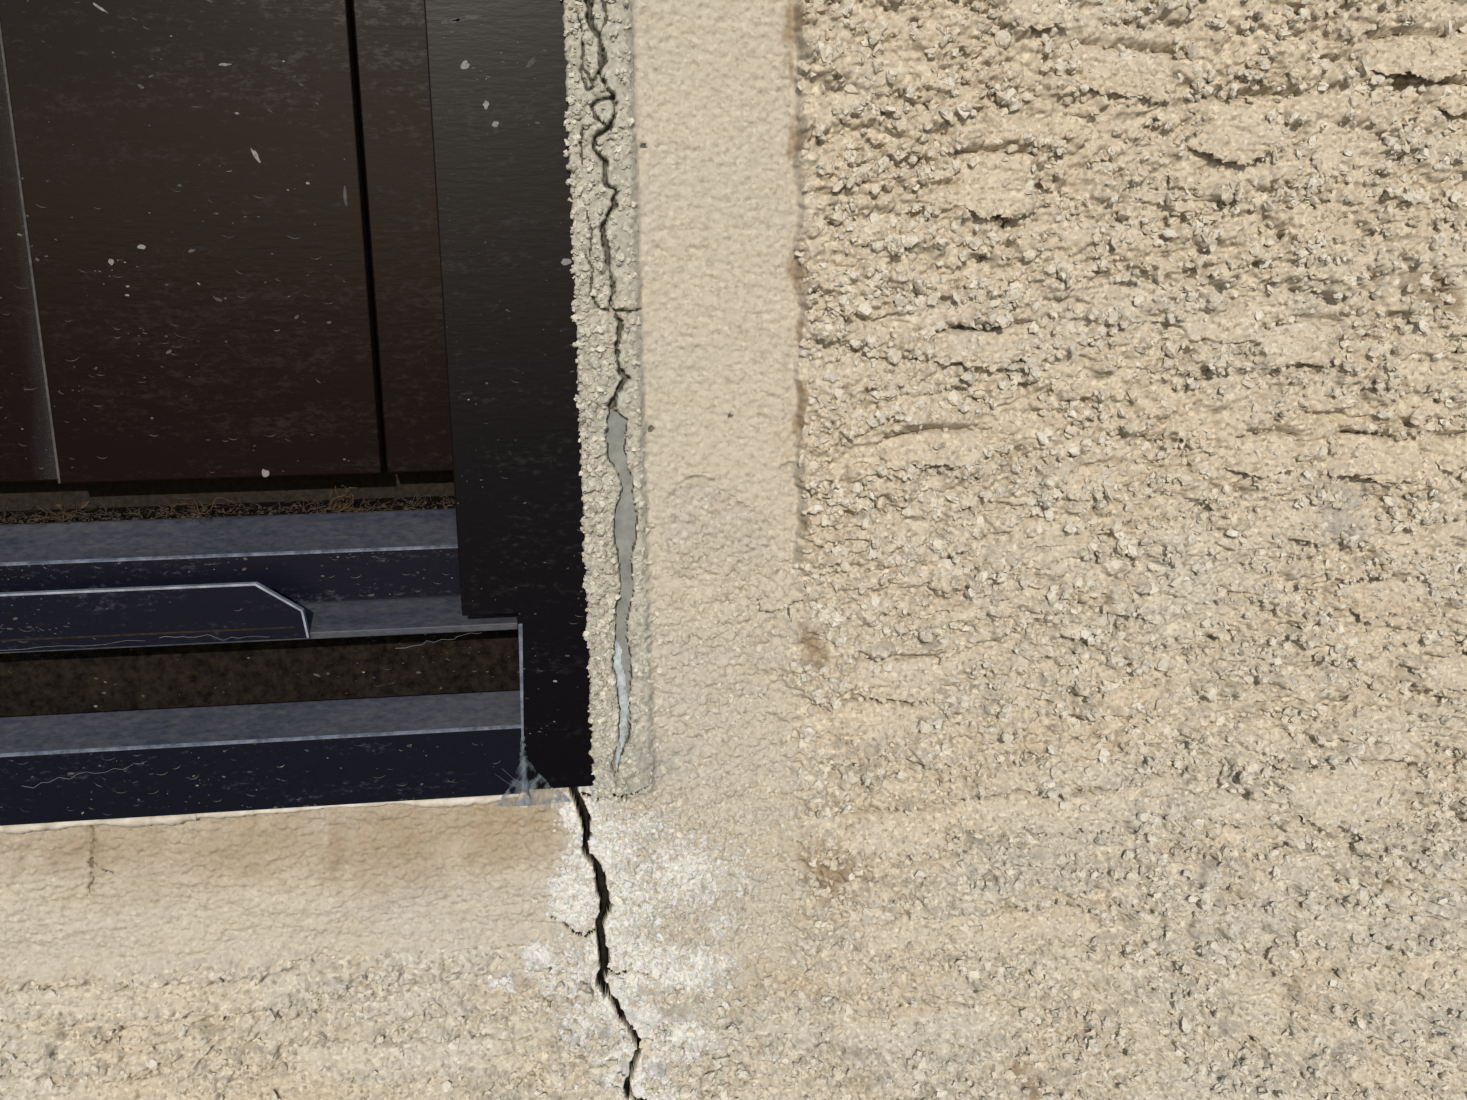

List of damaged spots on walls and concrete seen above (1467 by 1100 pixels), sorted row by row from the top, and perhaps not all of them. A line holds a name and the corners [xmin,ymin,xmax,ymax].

crack [551,0,649,1100]